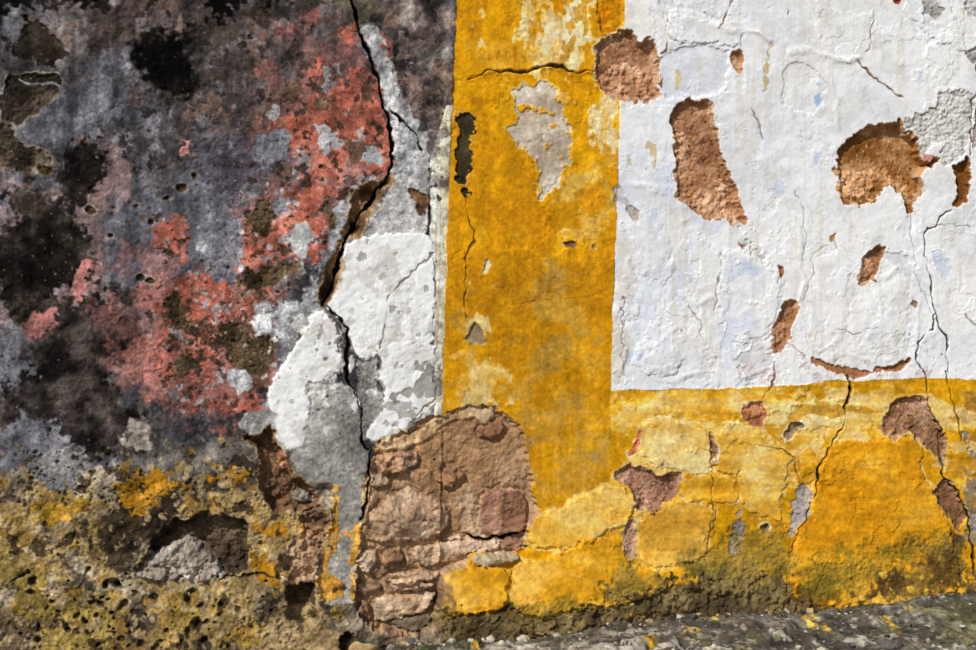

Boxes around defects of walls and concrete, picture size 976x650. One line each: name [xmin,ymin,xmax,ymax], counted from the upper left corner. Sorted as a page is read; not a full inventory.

flaking render [0,14,68,176]
crack [468,63,596,81]
peeling [507,80,577,201]
flaking render [593,0,748,227]
flaking render [832,88,976,215]
crack [318,0,454,523]
crack [794,190,846,302]
leakage [88,497,188,580]
flaking render [134,51,542,650]
crack [743,375,853,552]
crack [909,210,976,570]
leakage [0,597,42,650]